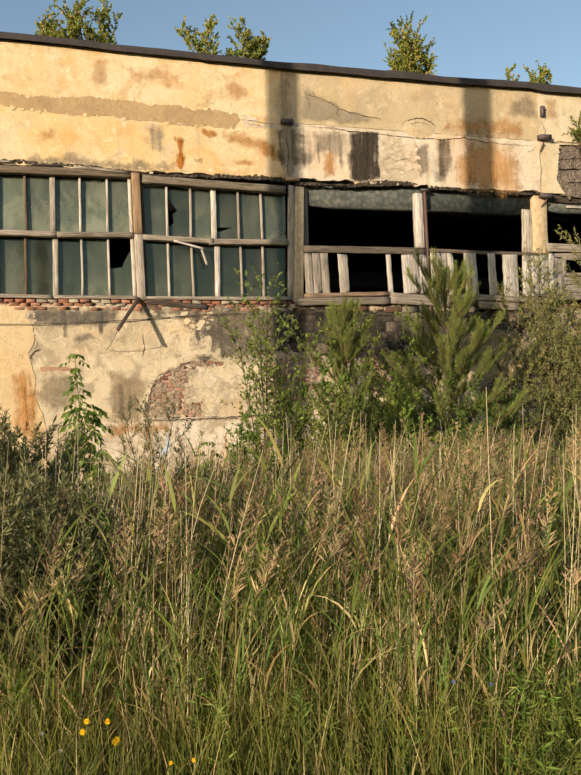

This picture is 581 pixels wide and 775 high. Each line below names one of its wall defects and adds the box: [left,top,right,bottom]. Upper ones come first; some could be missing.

peeling [0,91,283,133]
corrosion [174,138,184,169]
water stain [301,91,380,183]
crack [248,89,578,187]
water stain [417,141,451,182]
corrosion [457,120,520,193]
spalling [554,145,581,203]
spalling [139,301,548,466]